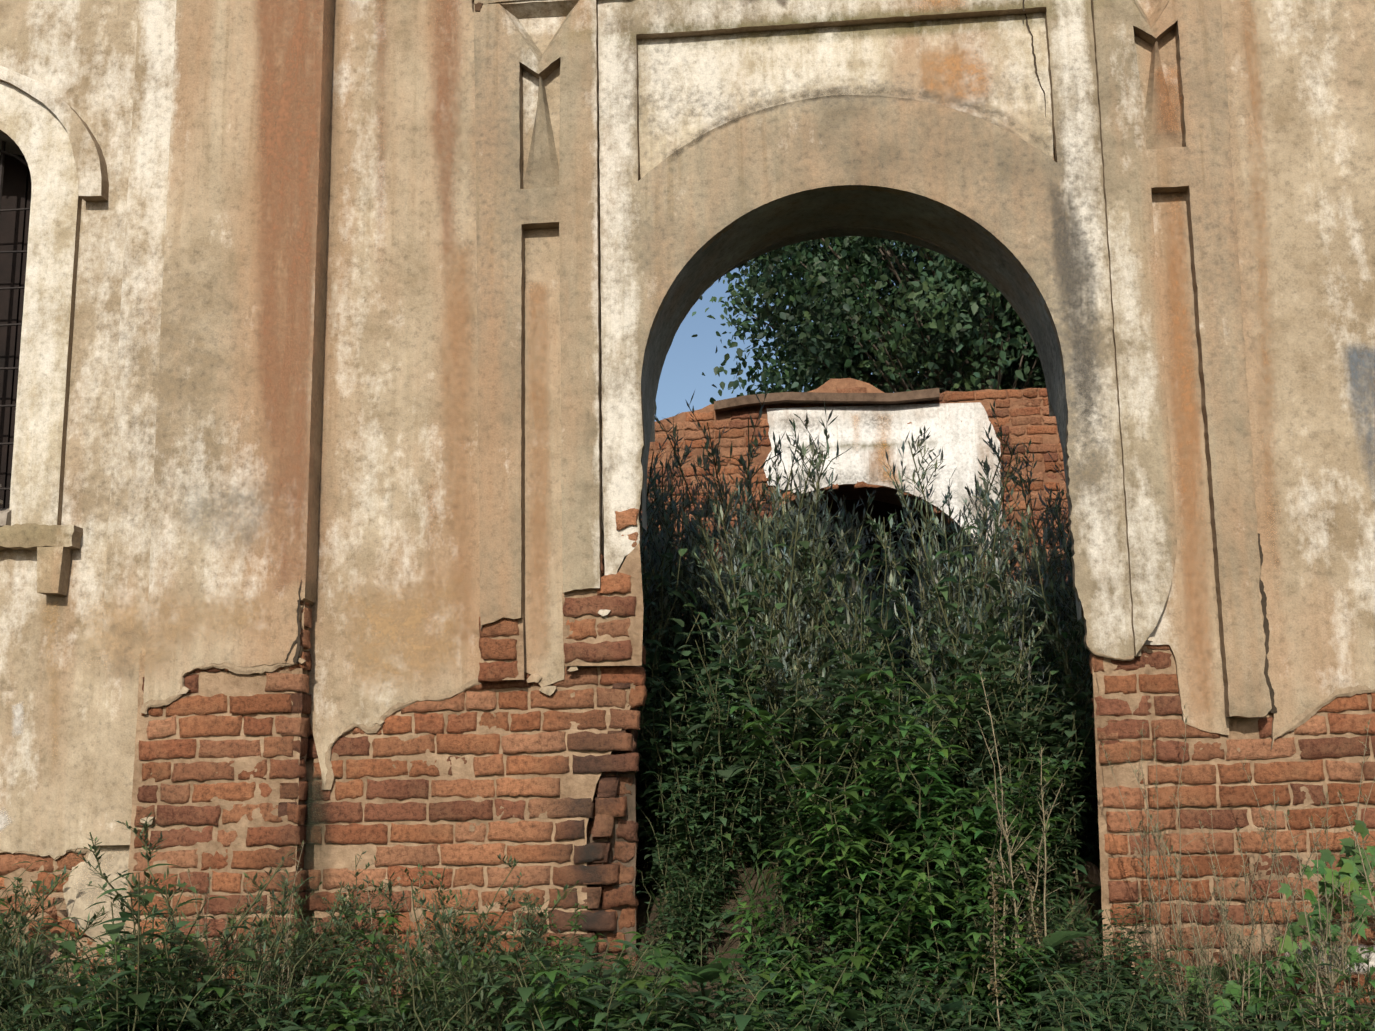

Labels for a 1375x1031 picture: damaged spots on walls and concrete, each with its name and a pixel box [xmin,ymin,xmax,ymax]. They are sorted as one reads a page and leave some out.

crack [1022,0,1046,116]
flaking render [0,508,647,1019]
flaking render [1085,637,1375,1005]
crack [1258,533,1277,713]